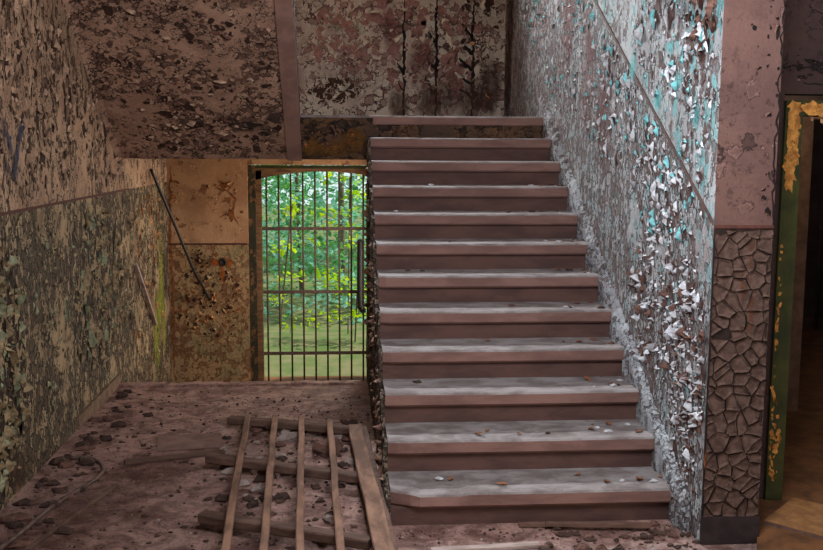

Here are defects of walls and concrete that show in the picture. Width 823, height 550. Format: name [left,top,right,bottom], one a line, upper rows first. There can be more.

peeling [0,0,126,196]
peeling [81,0,136,22]
peeling [100,0,282,156]
peeling [305,0,501,105]
peeling [0,173,180,501]
peeling [177,248,243,346]
flaking render [363,167,384,487]
peeling [520,0,719,493]
crack [702,0,823,517]
peeling [774,276,782,351]
peeling [768,365,781,481]